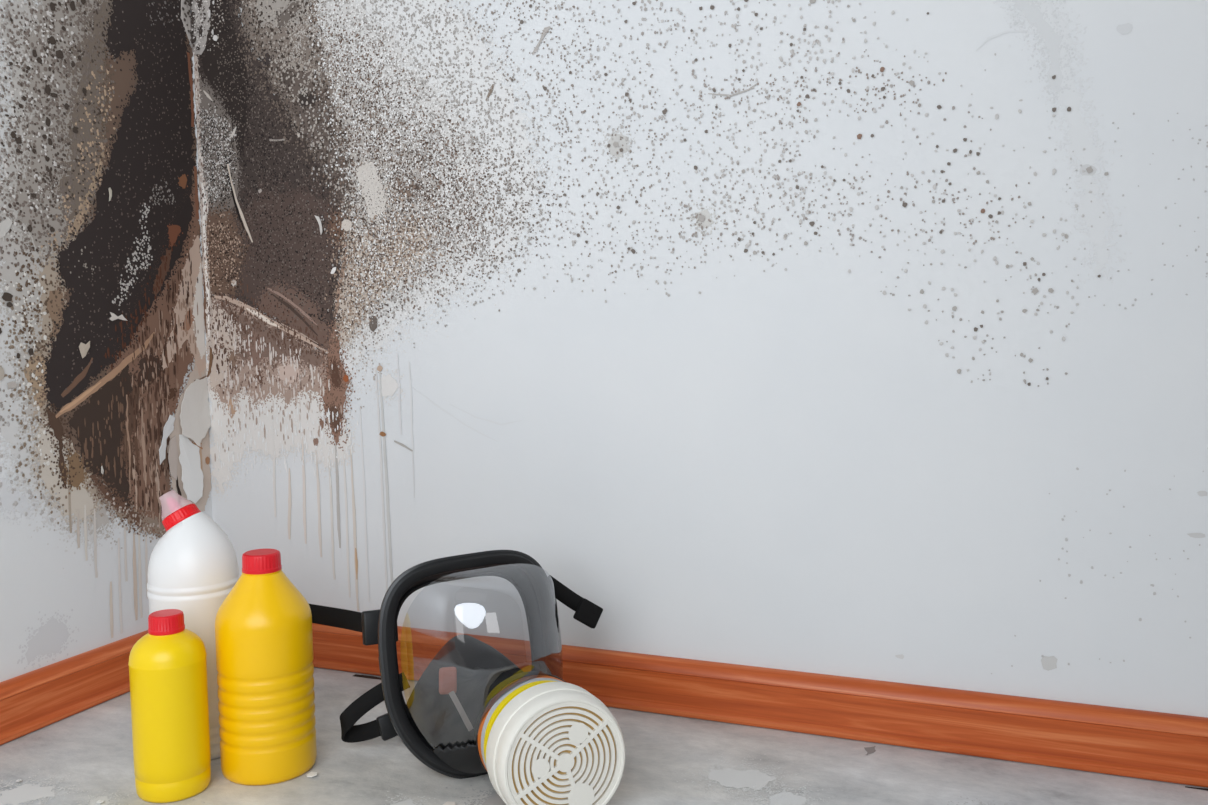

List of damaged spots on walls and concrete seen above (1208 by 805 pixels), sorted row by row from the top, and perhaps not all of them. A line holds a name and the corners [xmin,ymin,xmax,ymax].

peeling [79,341,90,358]
peeling [159,55,262,512]
leakage [0,0,1137,638]